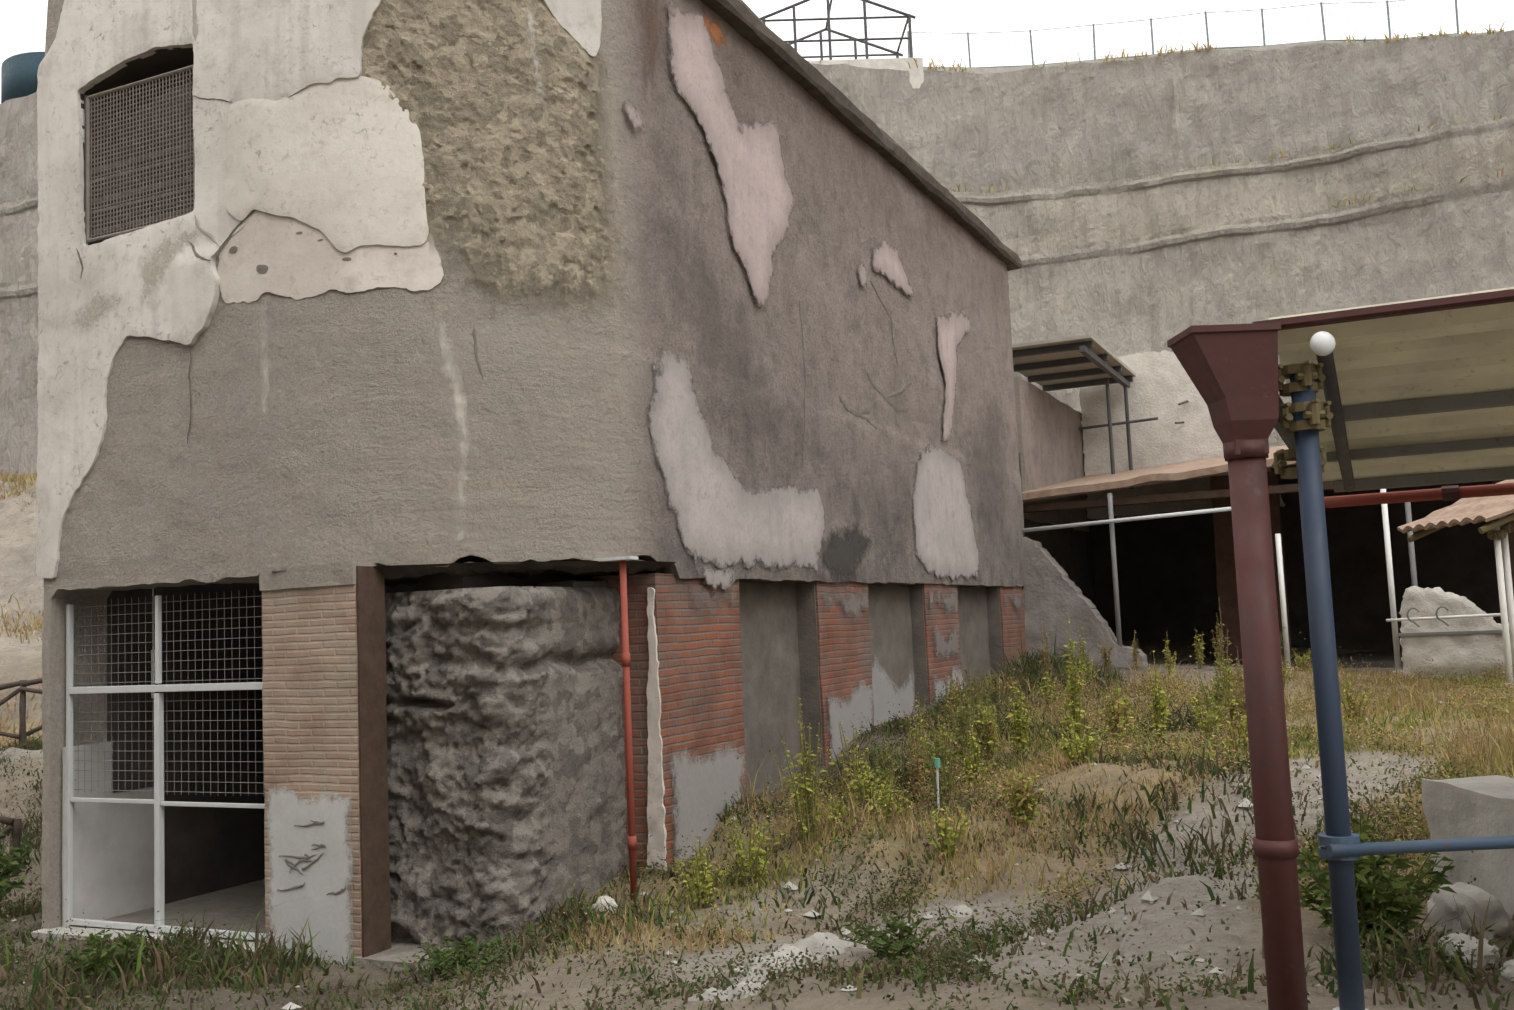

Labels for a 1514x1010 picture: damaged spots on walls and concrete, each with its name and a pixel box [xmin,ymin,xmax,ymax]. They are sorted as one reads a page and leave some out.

crack [191,0,199,41]
crack [189,210,255,261]
peeling [35,0,645,578]
peeling [665,3,793,308]
peeling [857,241,914,297]
peeling [646,349,825,591]
peeling [912,312,979,581]